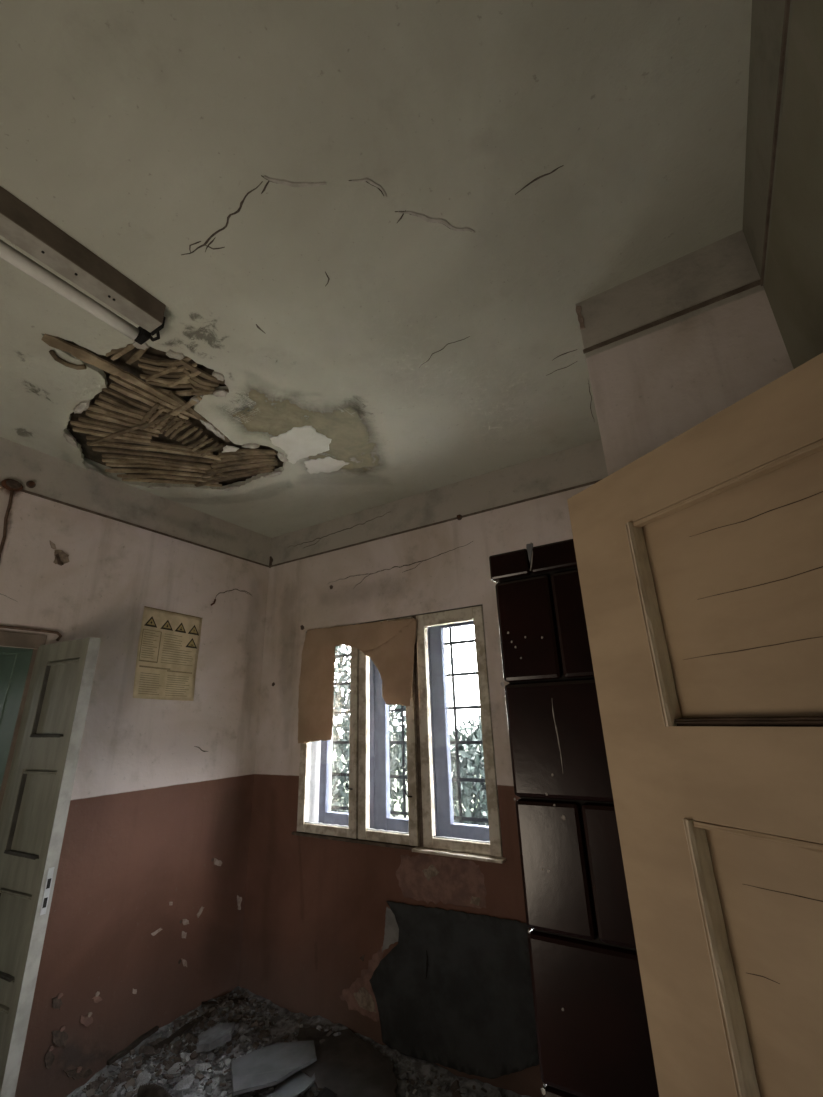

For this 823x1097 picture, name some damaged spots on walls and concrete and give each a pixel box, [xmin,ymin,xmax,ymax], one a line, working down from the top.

crack [181,175,475,255]
crack [515,165,564,195]
spalling [41,334,349,491]
peeling [339,907,399,1022]